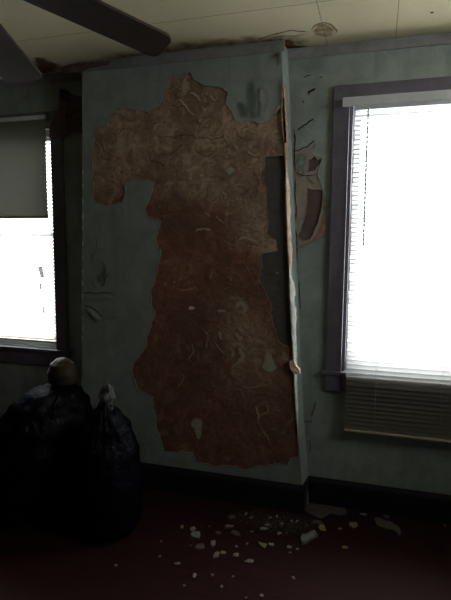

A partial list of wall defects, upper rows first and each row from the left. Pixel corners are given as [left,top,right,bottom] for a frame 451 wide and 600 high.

peeling [82,70,329,472]
crack [275,79,316,255]